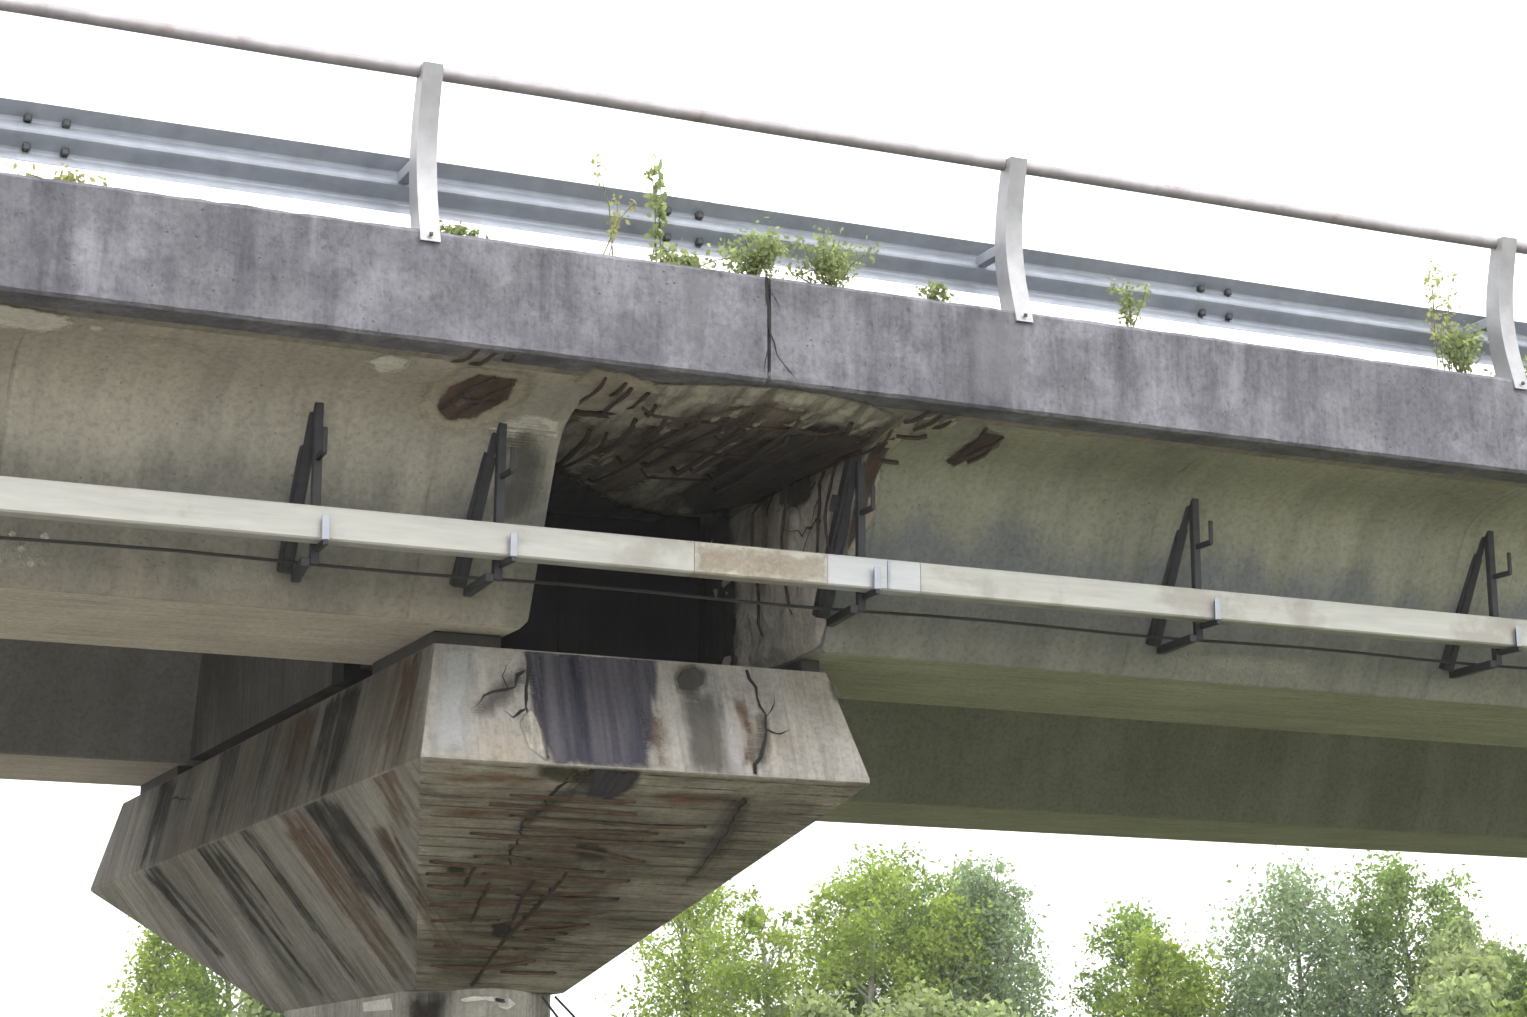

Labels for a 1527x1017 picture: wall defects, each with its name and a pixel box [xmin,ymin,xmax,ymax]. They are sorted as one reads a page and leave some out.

crack [764,277,797,380]
spalling [421,349,958,556]
spalling [946,427,1004,466]
spalling [675,578,836,694]
leakage [140,781,222,955]
leakage [198,748,318,991]
leakage [242,832,352,977]
leakage [304,687,412,935]
crack [470,654,589,865]
leakage [525,651,657,800]
crack [682,670,789,885]